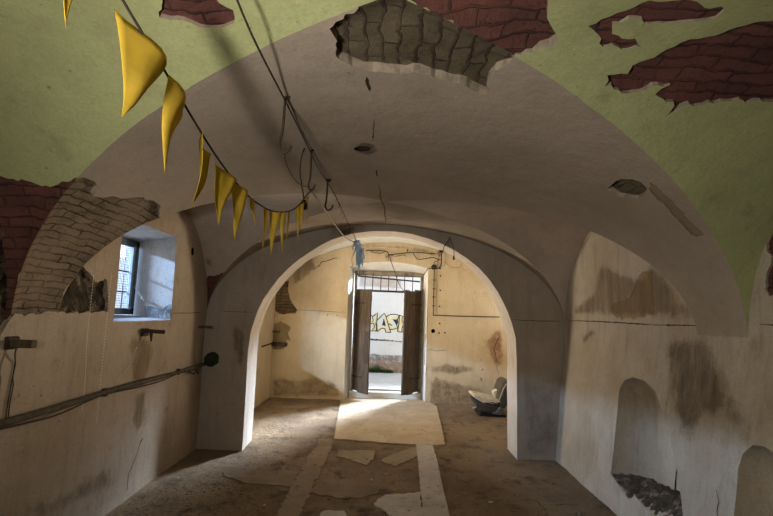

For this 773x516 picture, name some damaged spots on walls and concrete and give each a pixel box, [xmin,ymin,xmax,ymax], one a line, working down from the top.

flaking render [158,0,235,28]
flaking render [330,0,557,95]
peeling [589,0,725,50]
flaking render [605,21,773,117]
flaking render [0,176,161,335]
flaking render [145,304,171,319]
flaking render [272,281,297,349]